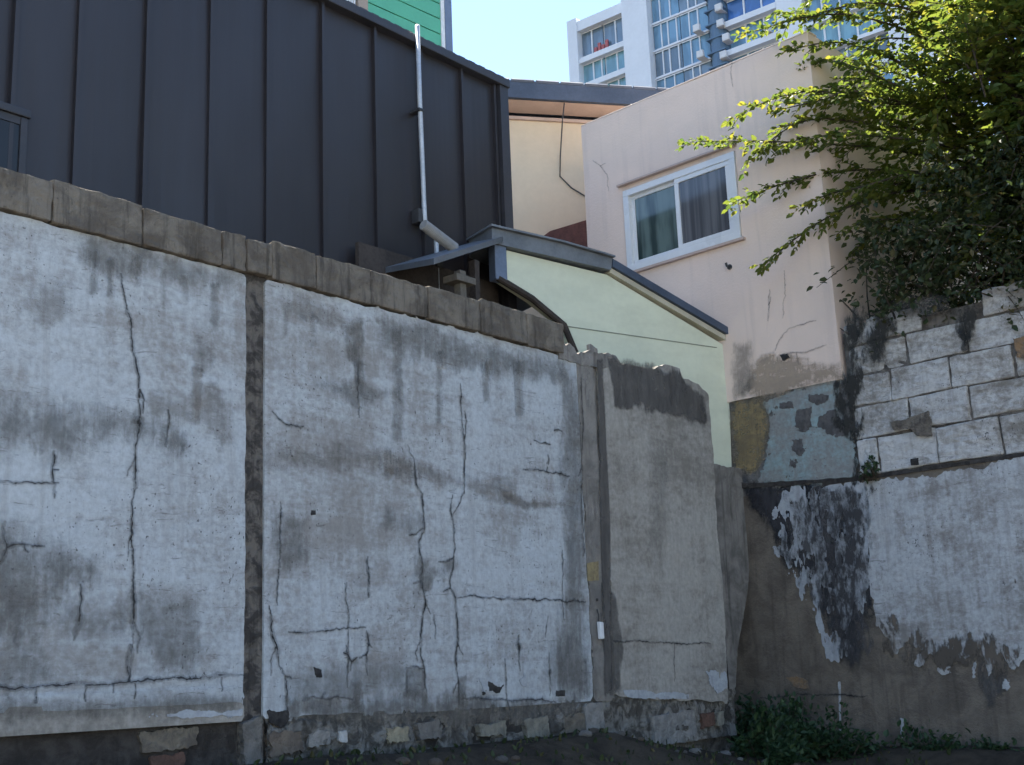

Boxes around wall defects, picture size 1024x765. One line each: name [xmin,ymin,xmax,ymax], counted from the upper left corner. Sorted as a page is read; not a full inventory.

leakage [348,322,363,364]
leakage [747,354,842,397]
leakage [961,333,970,351]
crack [0,276,223,702]
crack [269,501,370,718]
crack [406,384,585,710]
crack [615,640,706,682]
peeling [757,379,1024,691]